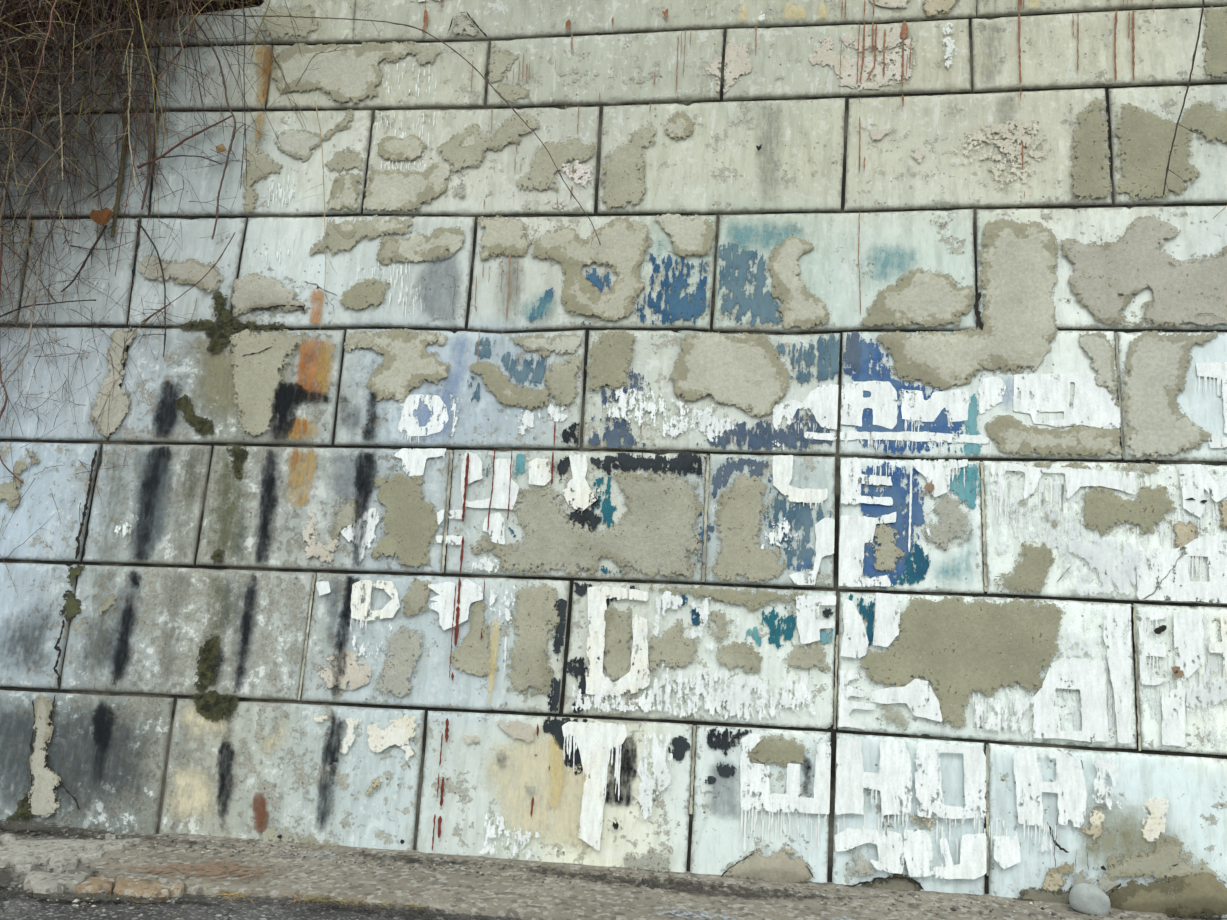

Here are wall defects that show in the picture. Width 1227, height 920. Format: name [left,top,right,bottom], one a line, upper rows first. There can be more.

corrosion [841,0,912,106]
spalling [515,136,596,211]
spalling [449,468,808,698]
spalling [783,641,831,674]